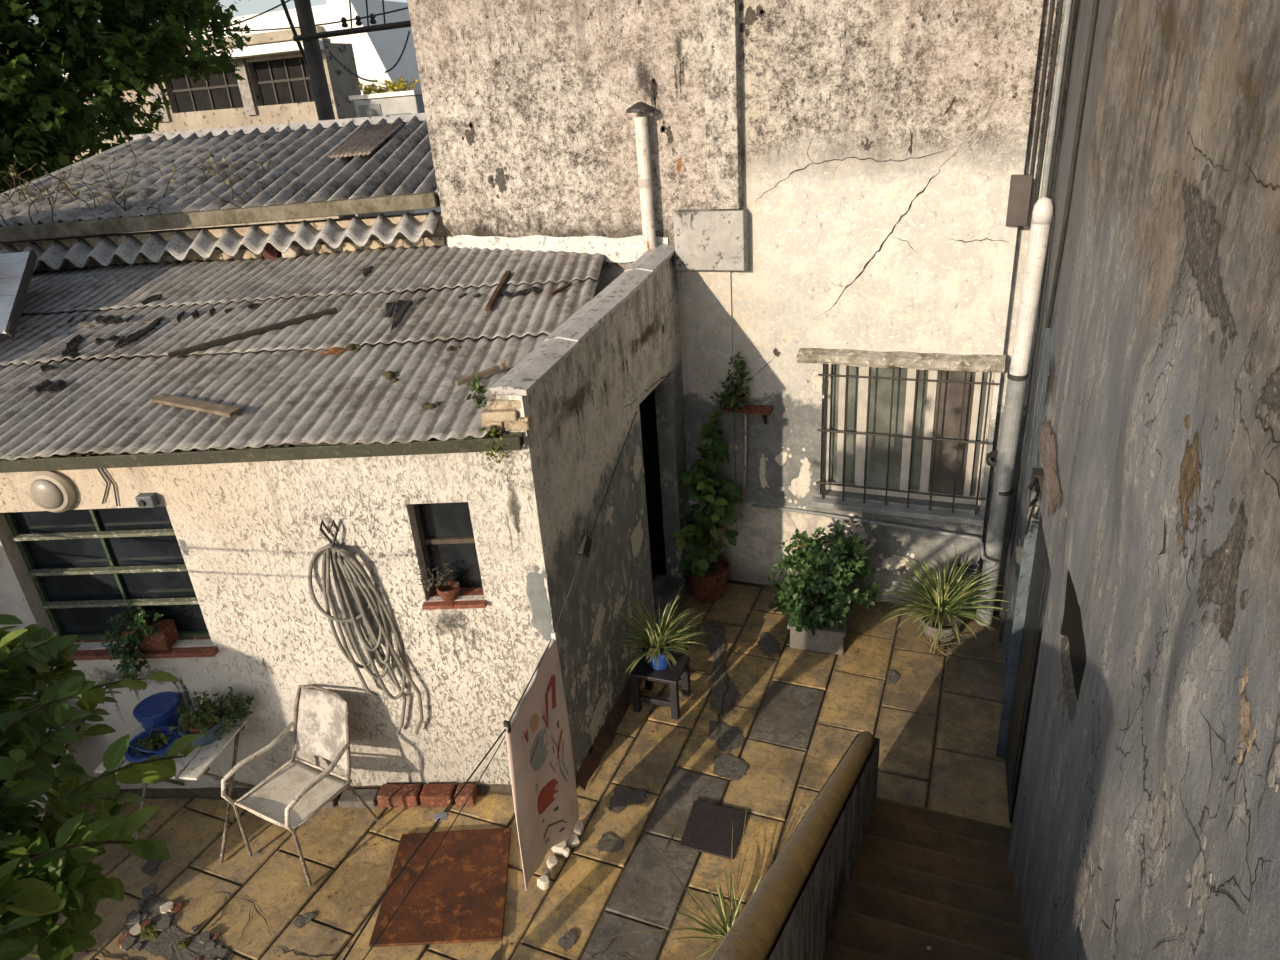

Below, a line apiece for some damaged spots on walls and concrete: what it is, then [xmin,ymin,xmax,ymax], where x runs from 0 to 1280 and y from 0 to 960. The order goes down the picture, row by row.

crack [758,86,1007,317]
spalling [1173,164,1238,365]
leakage [555,381,607,424]
spalling [1248,353,1280,430]
peeling [758,446,816,510]
spalling [1176,415,1199,547]
spalling [1192,477,1254,643]
crack [1115,654,1280,846]
crack [1088,855,1121,945]
crack [1204,883,1243,913]